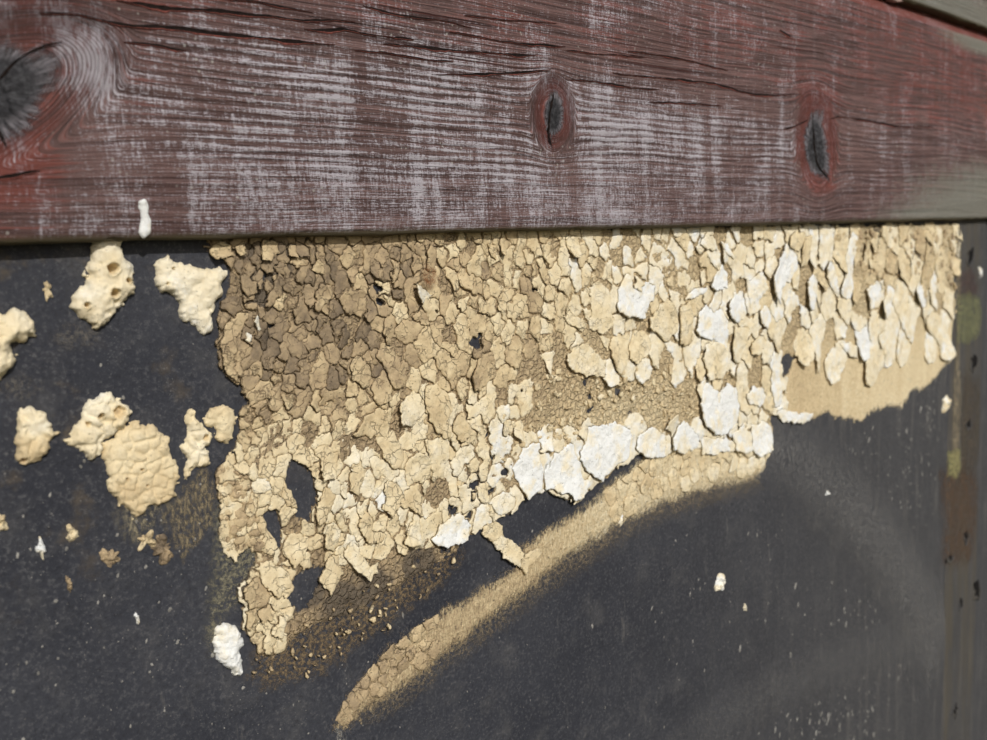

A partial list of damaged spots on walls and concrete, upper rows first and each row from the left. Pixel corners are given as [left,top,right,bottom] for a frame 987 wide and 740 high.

peeling [202,222,963,730]